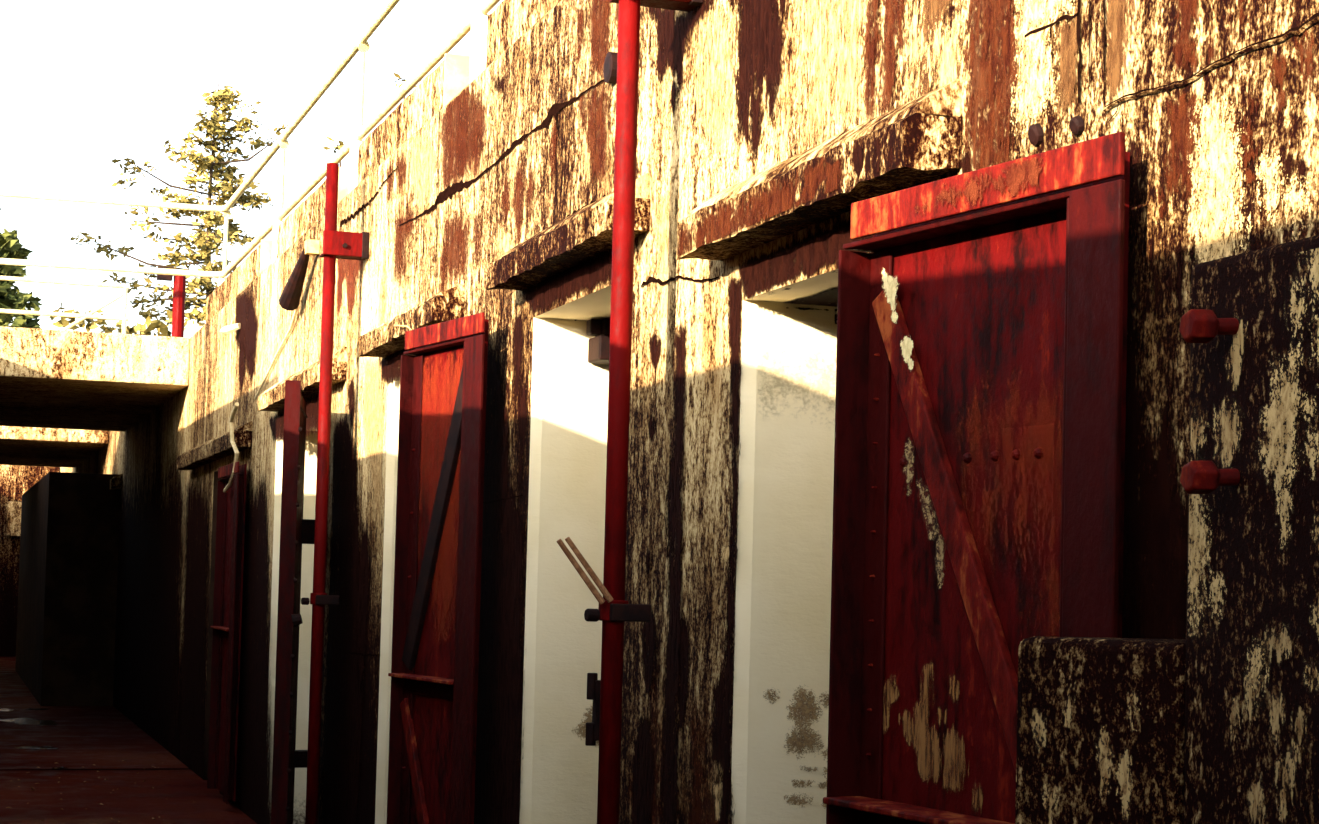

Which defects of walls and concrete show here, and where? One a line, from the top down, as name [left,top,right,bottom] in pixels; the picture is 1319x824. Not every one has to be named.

crack [340,166,398,227]
damp [439,75,505,192]
crack [399,79,604,272]
damp [648,0,785,160]
damp [862,0,951,121]
damp [953,0,1021,174]
crack [1024,0,1319,122]
crack [641,275,719,288]
damp [632,219,873,824]